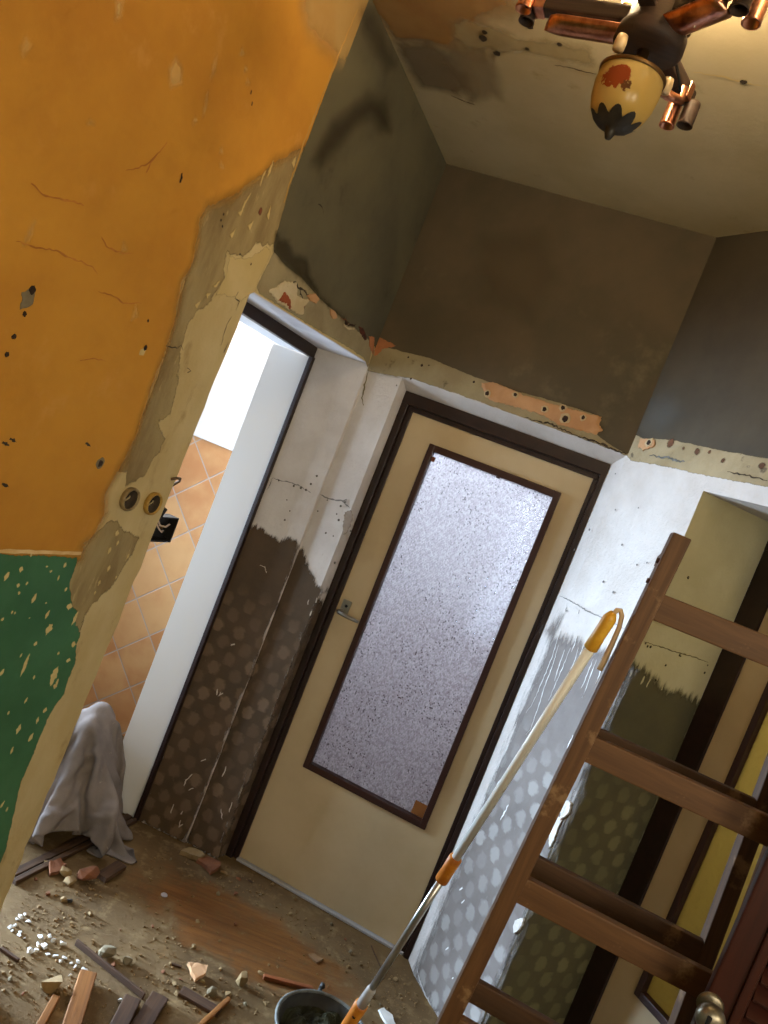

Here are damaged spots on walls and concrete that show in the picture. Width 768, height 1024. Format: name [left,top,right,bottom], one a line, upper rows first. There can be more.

damp [372,0,510,92]
crack [16,237,139,304]
peeling [119,147,305,485]
flaking render [269,280,320,315]
flaking render [473,381,603,435]
flaking render [638,438,655,451]
crack [268,479,350,508]
spalling [4,567,53,680]